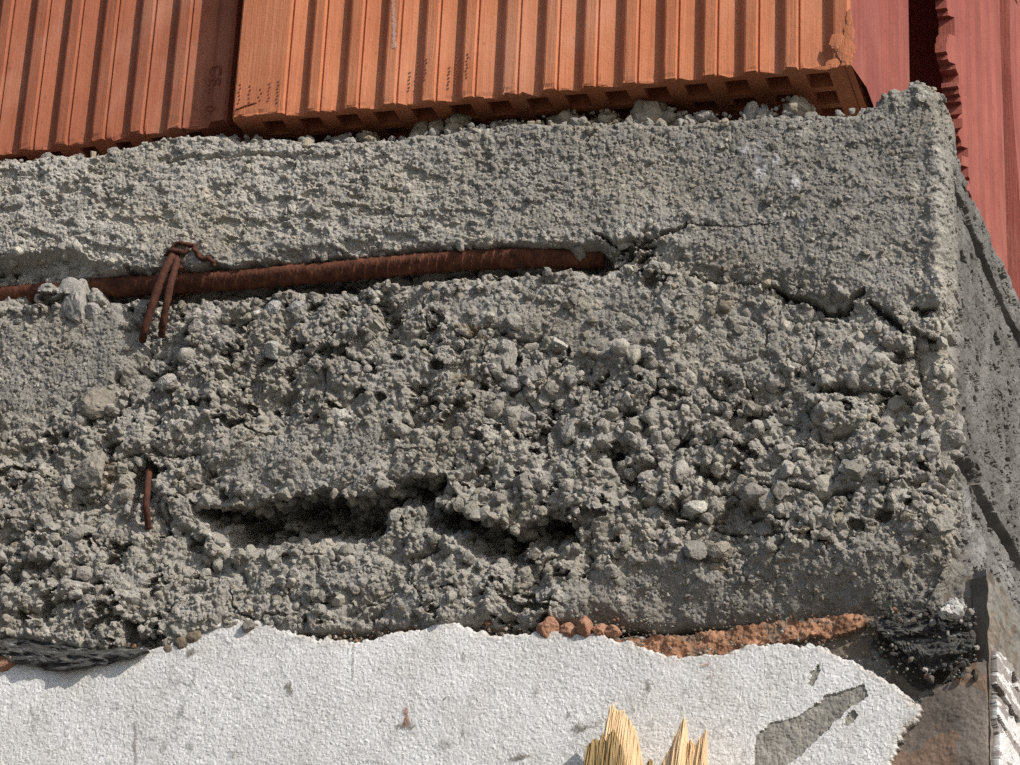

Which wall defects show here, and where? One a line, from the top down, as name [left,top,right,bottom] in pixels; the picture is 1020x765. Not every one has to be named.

crack [593,221,774,252]
spalling [0,240,616,312]
crack [689,272,912,365]
crack [826,379,884,400]